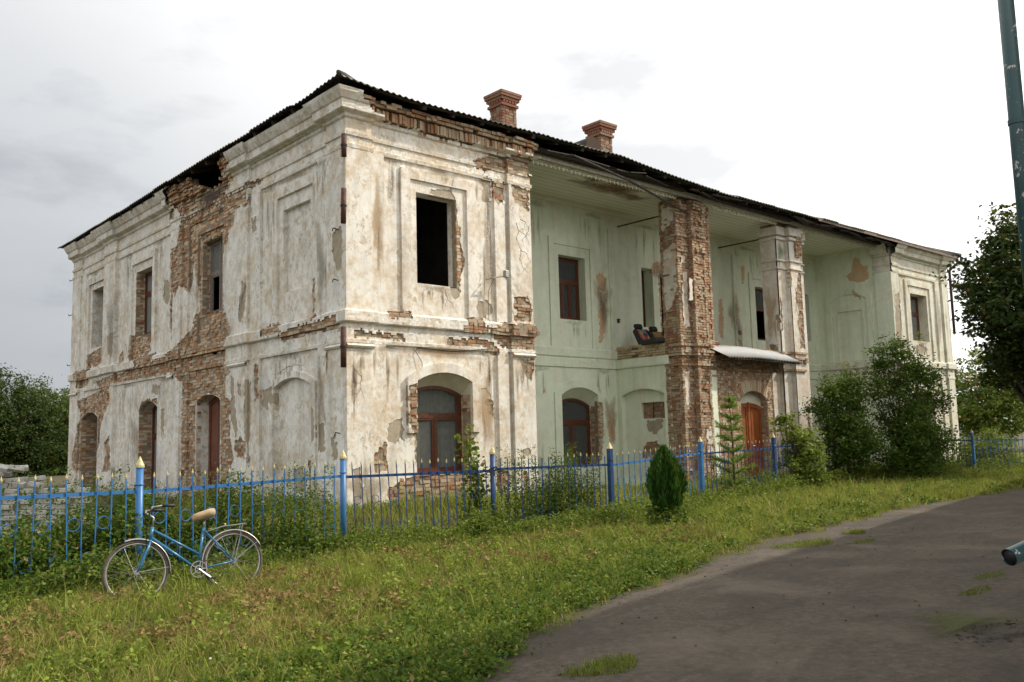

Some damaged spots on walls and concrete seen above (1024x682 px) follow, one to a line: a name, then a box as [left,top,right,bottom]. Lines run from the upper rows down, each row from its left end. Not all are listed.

spalling [72,178,278,499]
spalling [428,189,464,300]
leakage [598,288,608,327]
spalling [643,199,778,483]
peeling [846,254,870,300]
spalling [353,383,478,507]